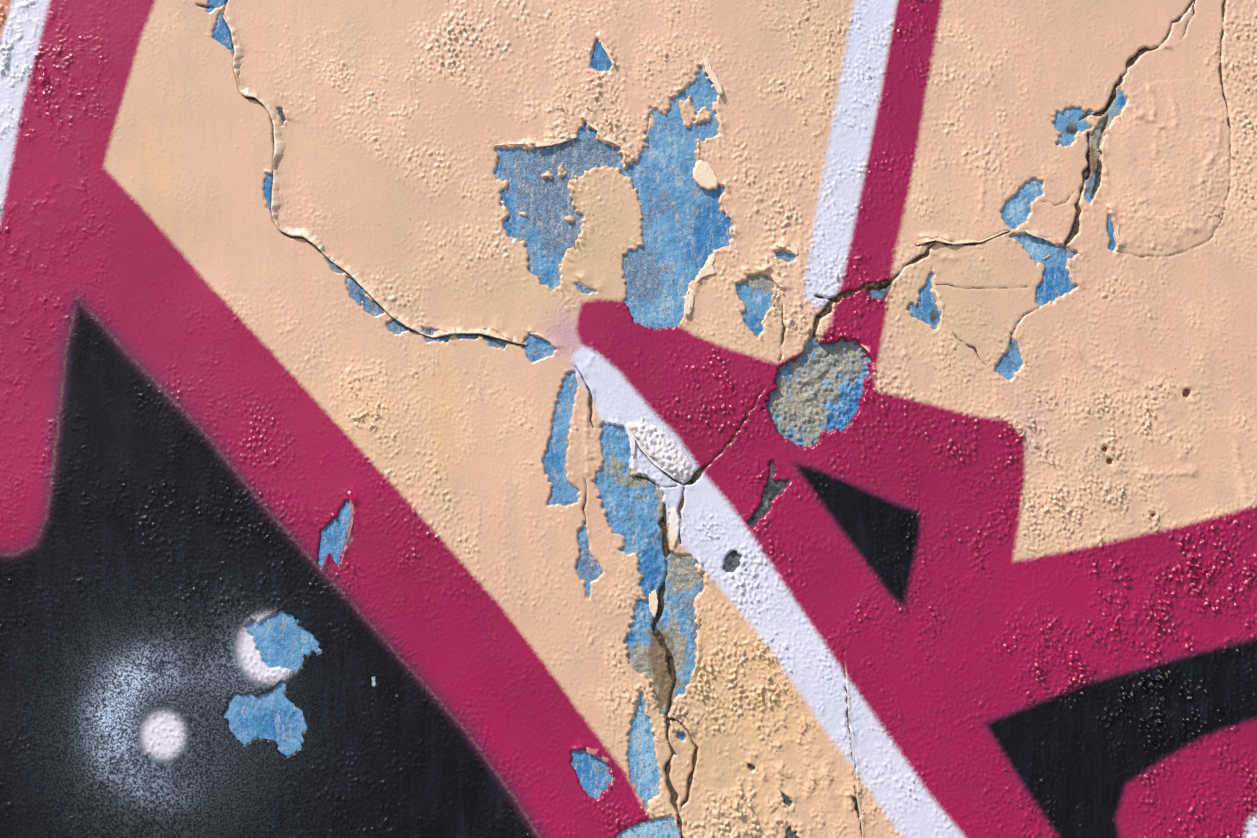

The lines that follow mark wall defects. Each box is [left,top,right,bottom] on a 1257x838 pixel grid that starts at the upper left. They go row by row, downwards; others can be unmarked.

crack [197,0,527,349]
peeling [494,56,733,330]
peeling [736,273,786,337]
crack [779,230,1038,361]
peeling [1001,178,1078,306]
crack [1043,0,1233,256]
peeling [543,371,580,506]
flaking render [766,335,871,447]
peeling [318,500,356,567]
peeling [223,610,322,756]
peeling [571,423,705,838]
crack [632,395,759,838]